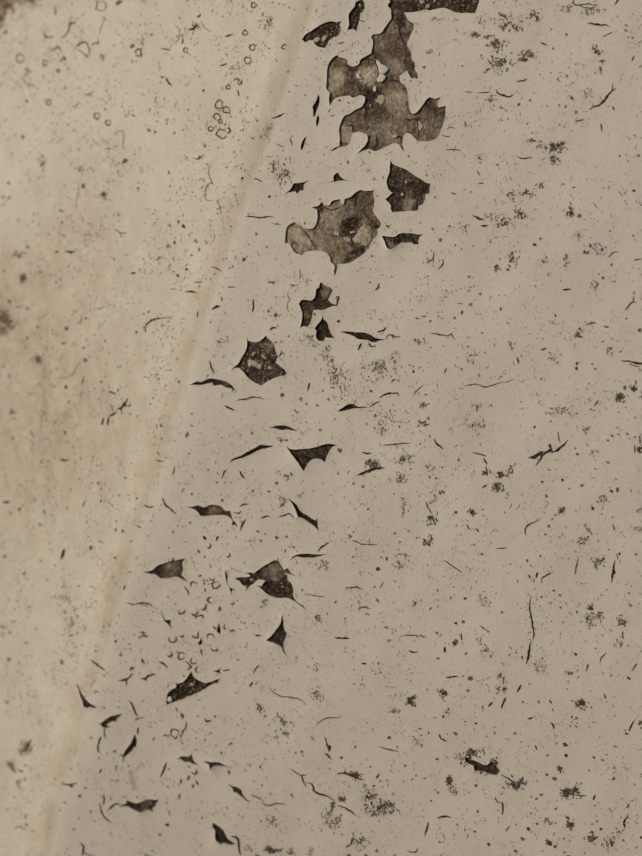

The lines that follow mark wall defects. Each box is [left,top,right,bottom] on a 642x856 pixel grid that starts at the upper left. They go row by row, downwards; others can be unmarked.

peeling [302,0,365,48]
peeling [313,0,479,153]
peeling [385,160,430,212]
peeling [285,190,423,276]
peeling [299,282,387,342]
peeling [231,336,286,385]
peeling [286,444,336,471]
spalling [185,505,237,527]
peeling [144,558,189,583]
peeling [225,554,326,609]
peeling [266,616,287,655]
peeling [166,668,221,705]